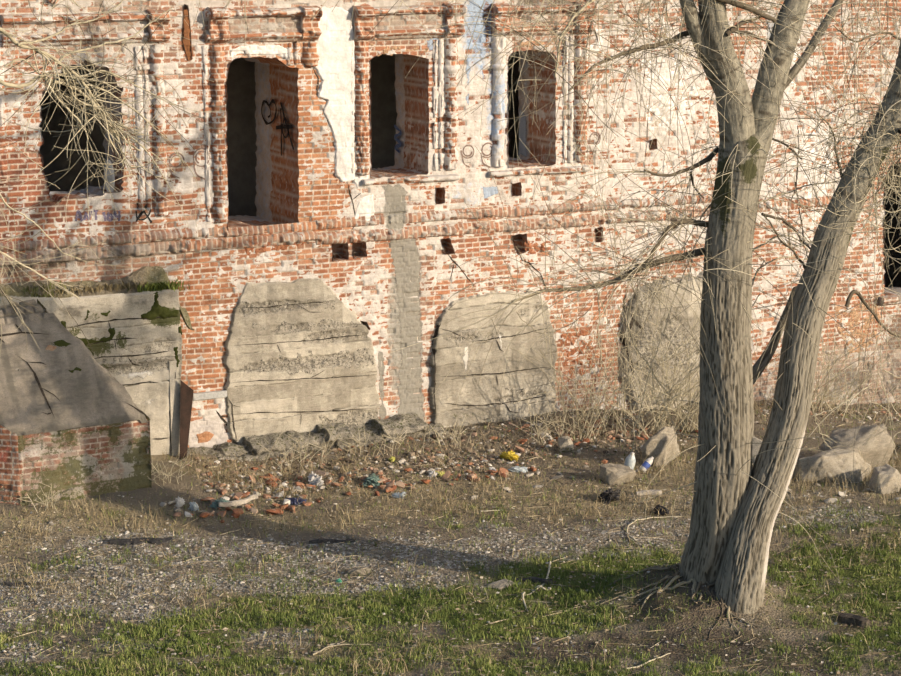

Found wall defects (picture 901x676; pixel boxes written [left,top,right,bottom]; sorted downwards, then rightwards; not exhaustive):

flaking render [230,45,288,60]
flaking render [313,7,375,221]
flaking render [638,45,706,131]
spalling [245,228,304,255]
spalling [524,241,551,254]
crack [0,325,61,418]